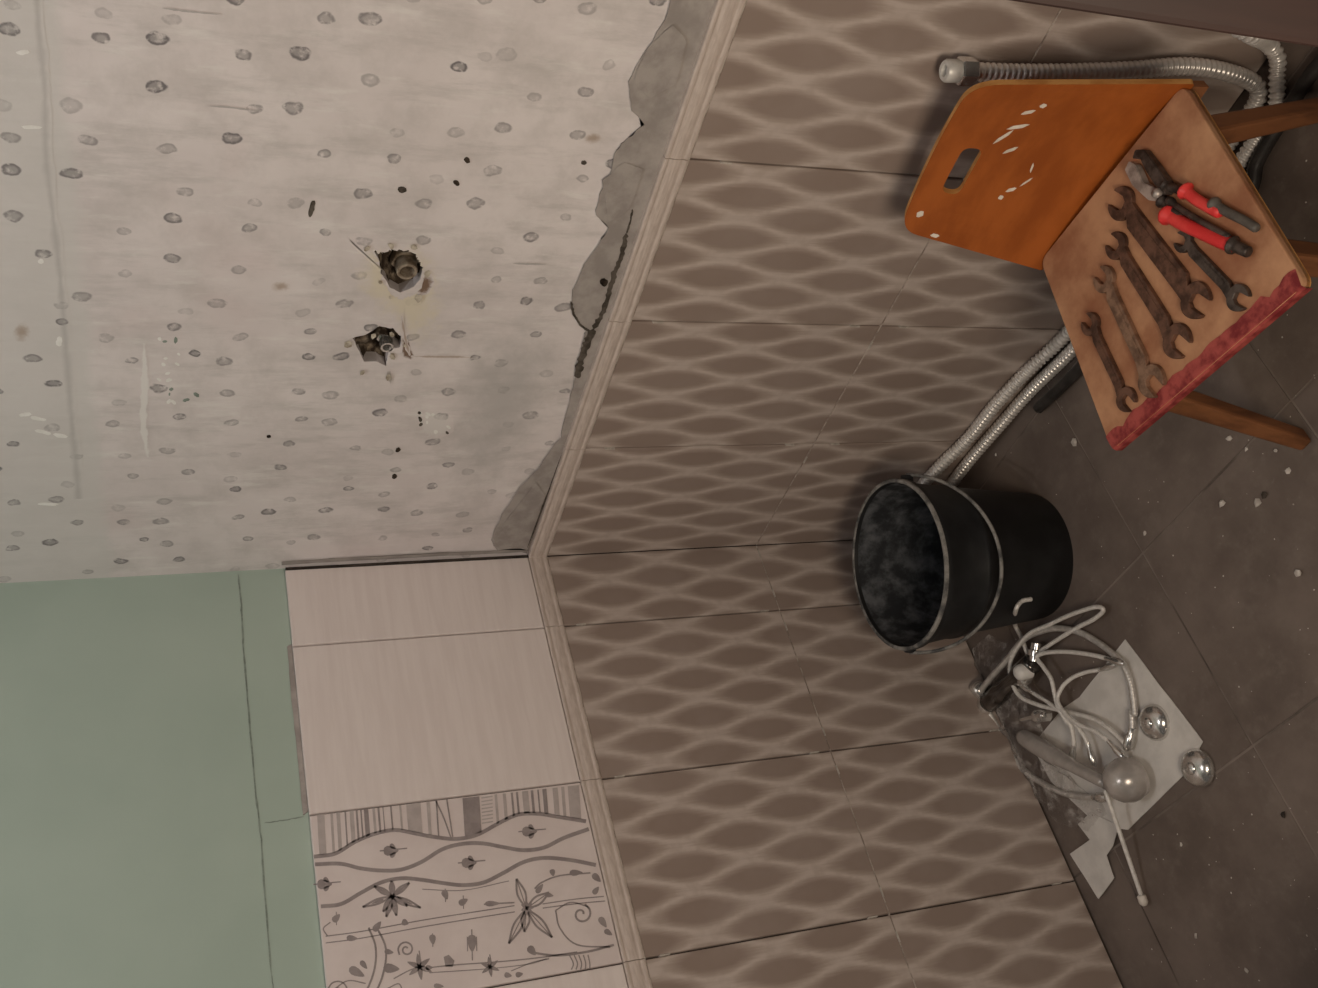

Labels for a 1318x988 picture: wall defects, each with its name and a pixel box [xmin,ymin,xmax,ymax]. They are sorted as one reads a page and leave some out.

spalling [364,243,430,299]
spalling [344,326,406,381]